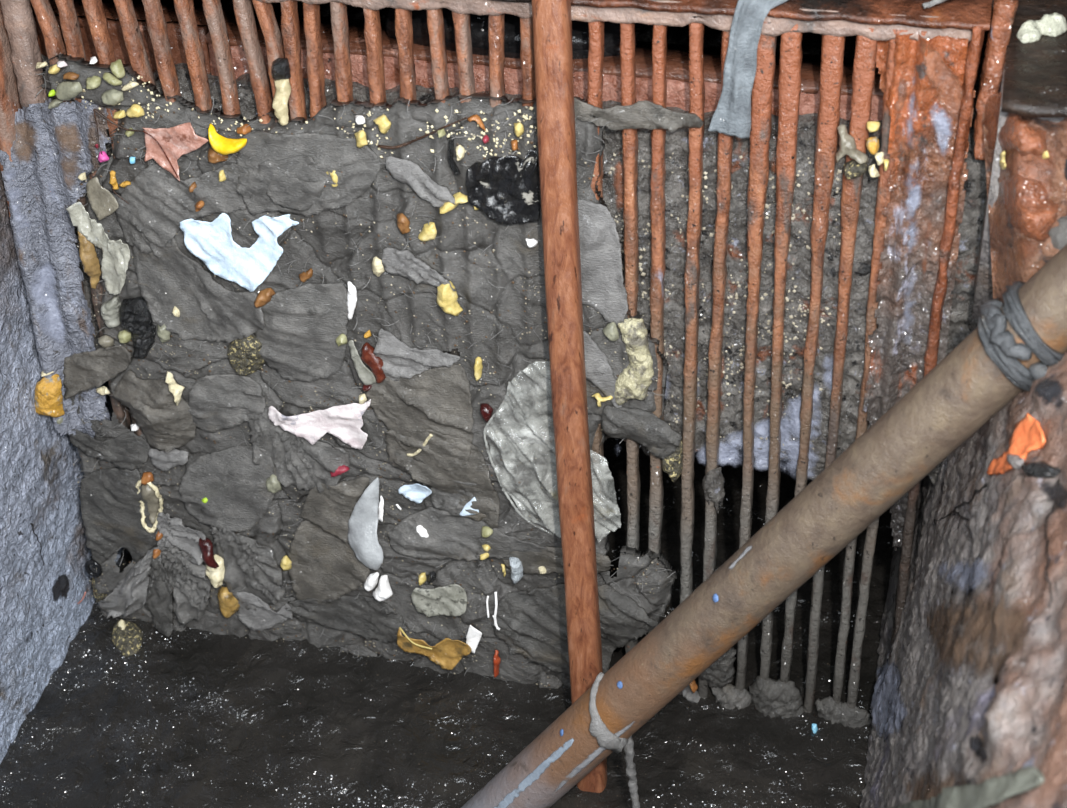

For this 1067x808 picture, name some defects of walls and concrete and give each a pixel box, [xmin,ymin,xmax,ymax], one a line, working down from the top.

rust [615,163,624,206]
rust [863,33,975,426]
rust [890,481,921,550]